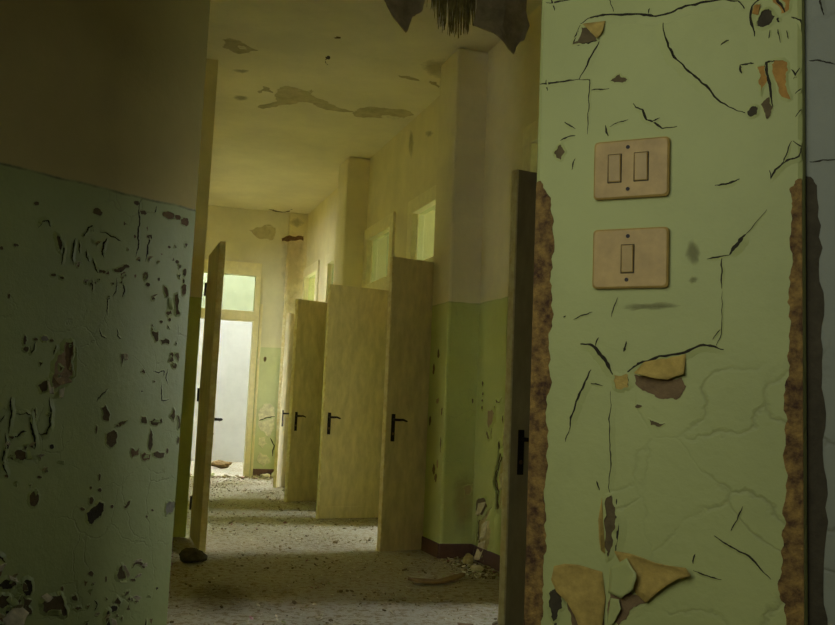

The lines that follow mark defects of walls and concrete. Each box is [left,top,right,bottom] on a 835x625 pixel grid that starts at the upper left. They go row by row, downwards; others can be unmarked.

peeling [257,85,415,120]
crack [540,78,678,136]
crack [580,0,745,121]
flaking render [739,57,793,120]
flaking render [749,0,801,36]
crack [766,138,835,183]
peeling [83,242,188,370]
crack [707,210,768,346]
crack [565,370,617,493]
flaking render [524,181,724,625]
flaking render [778,176,828,625]
crack [713,506,771,581]